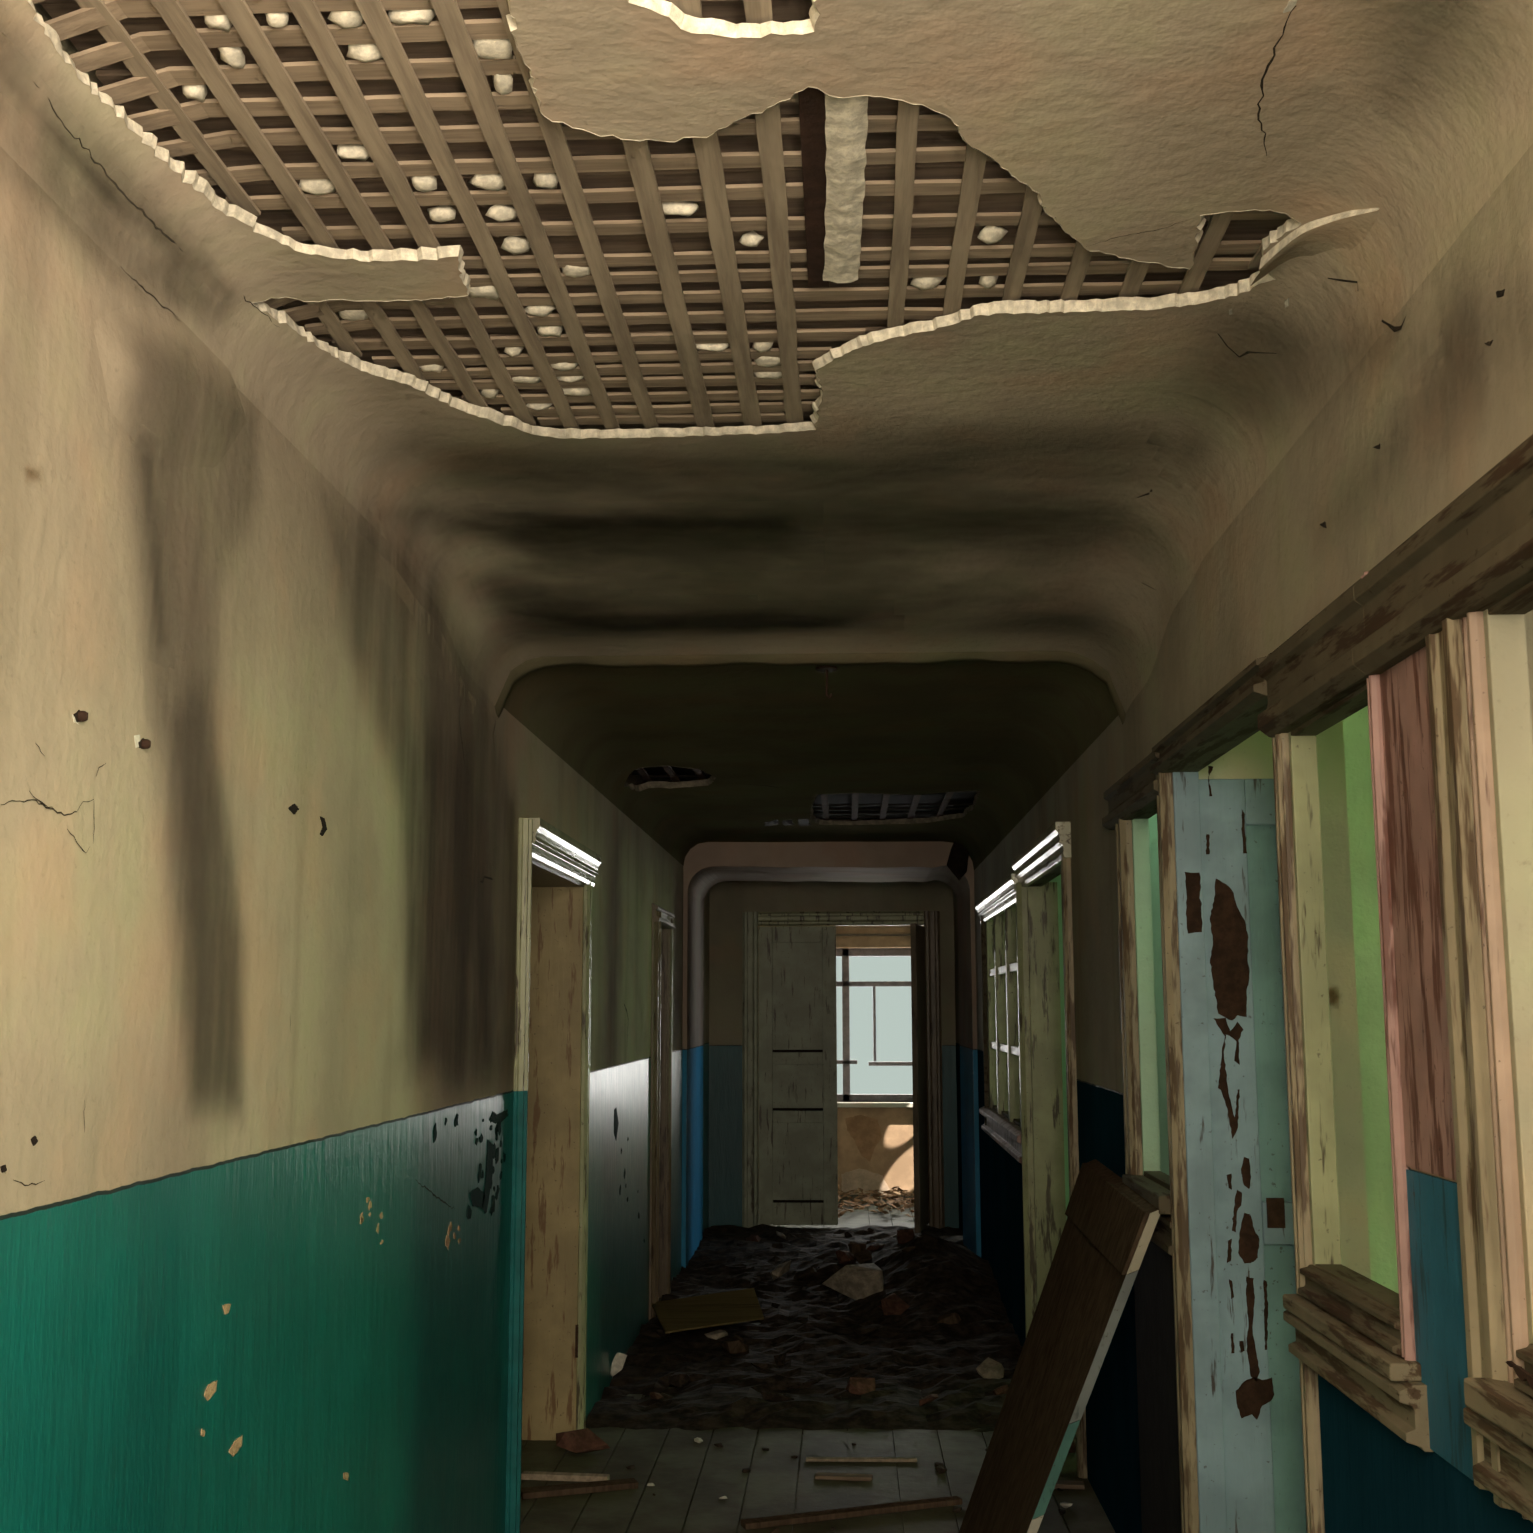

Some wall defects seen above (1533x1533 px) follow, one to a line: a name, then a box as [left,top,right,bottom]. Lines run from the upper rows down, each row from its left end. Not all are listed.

crack [1257,6,1296,156]
flaking render [27,0,1379,439]
peeling [433,1114,459,1143]
peeling [445,1109,509,1250]
peeling [1210,879,1250,1139]
peeling [1227,1157,1274,1420]